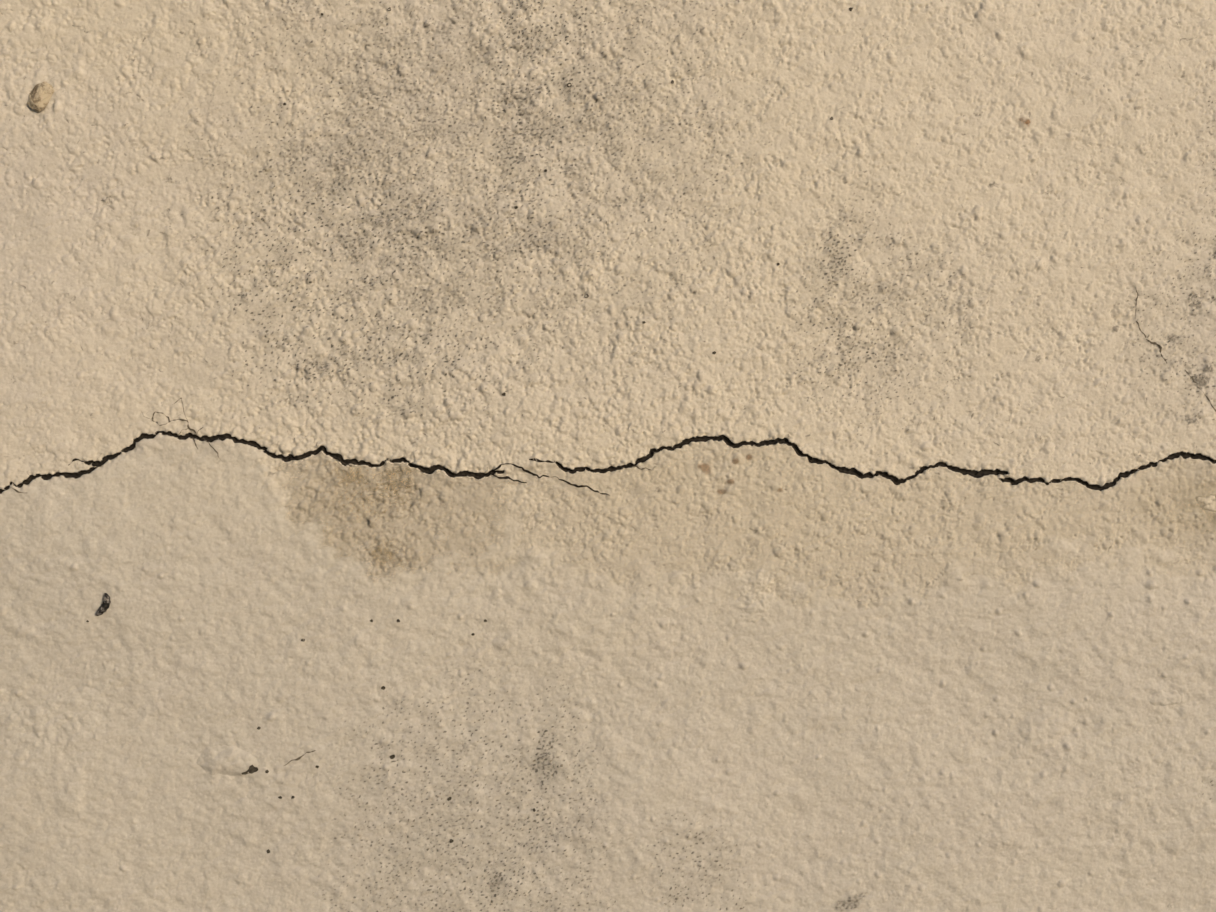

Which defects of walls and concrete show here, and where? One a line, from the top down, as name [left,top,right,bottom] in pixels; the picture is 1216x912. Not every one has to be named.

crack [1135,290,1216,412]
crack [0,398,1216,496]